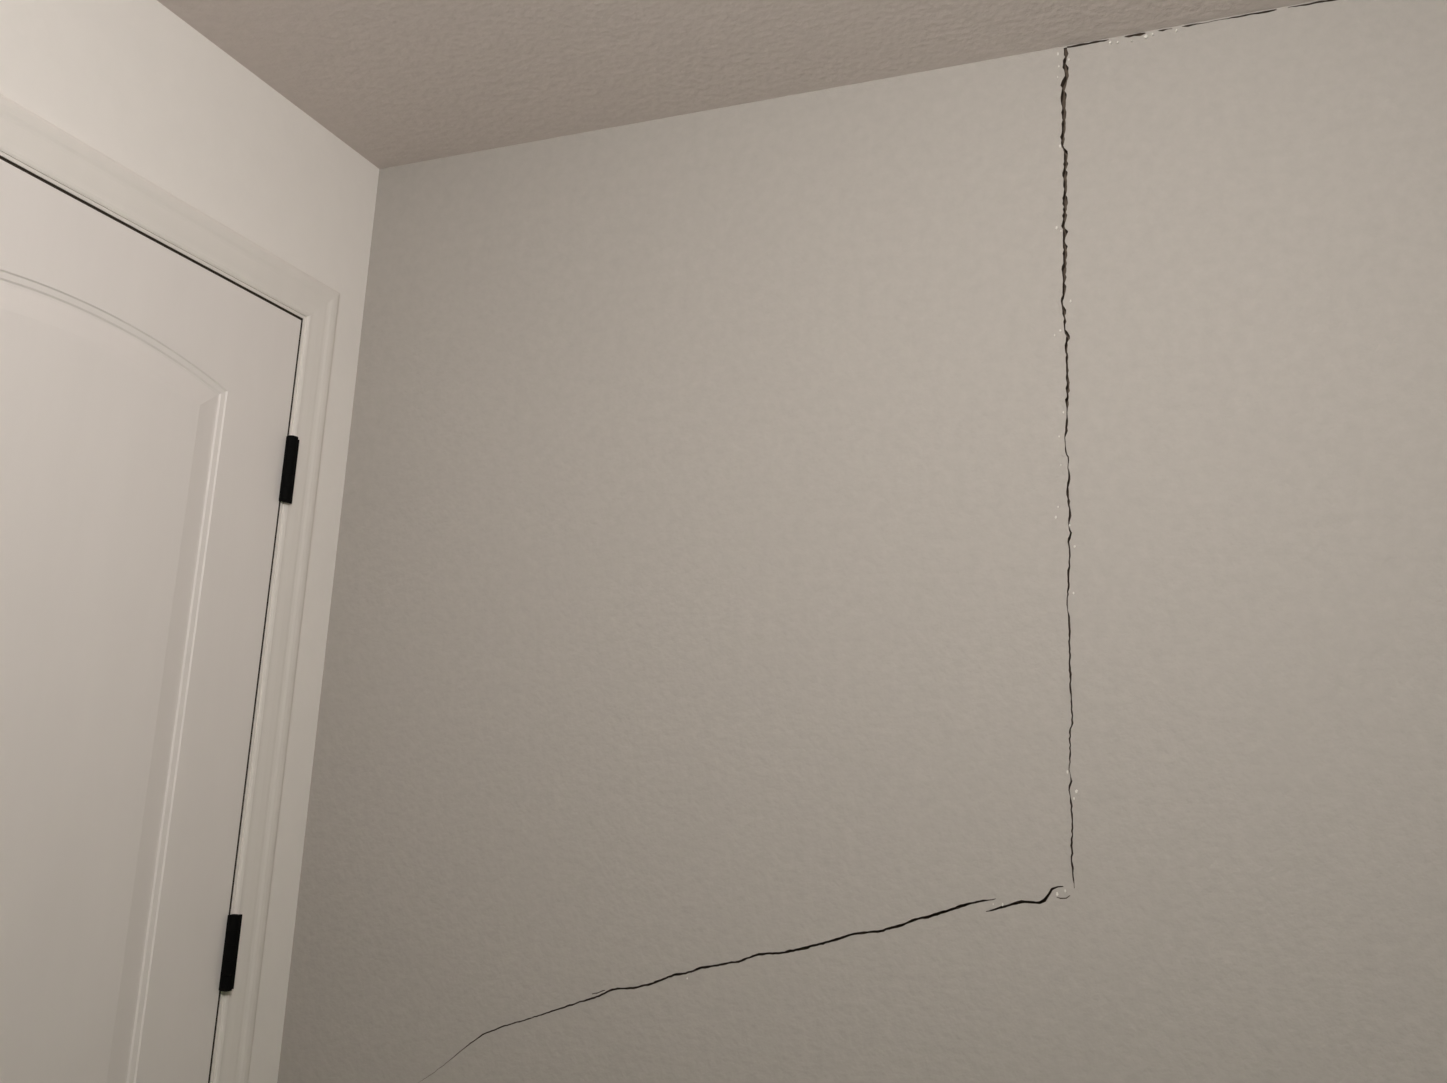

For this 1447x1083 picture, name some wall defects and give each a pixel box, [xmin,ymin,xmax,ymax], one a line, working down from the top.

crack [422,0,1336,1081]